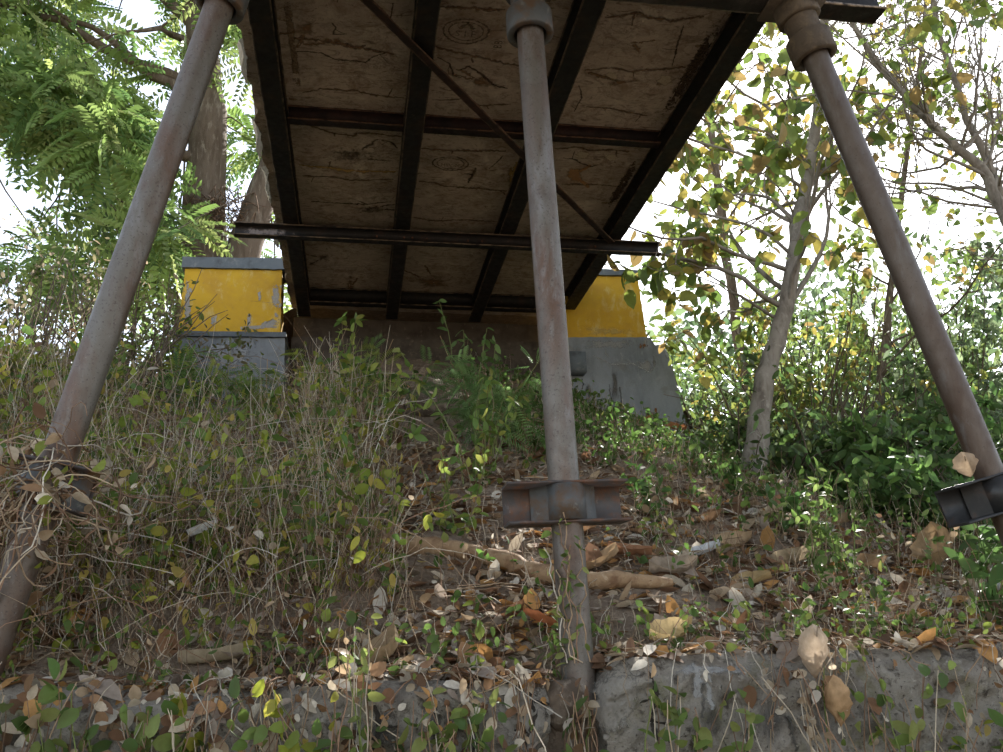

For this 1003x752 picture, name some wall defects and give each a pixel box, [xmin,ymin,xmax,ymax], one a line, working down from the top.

crack [293,0,394,63]
crack [303,88,401,98]
crack [435,46,519,109]
crack [572,12,704,122]
crack [299,126,505,205]
crack [555,146,630,187]
peeling [184,281,192,327]
peeling [240,285,282,330]